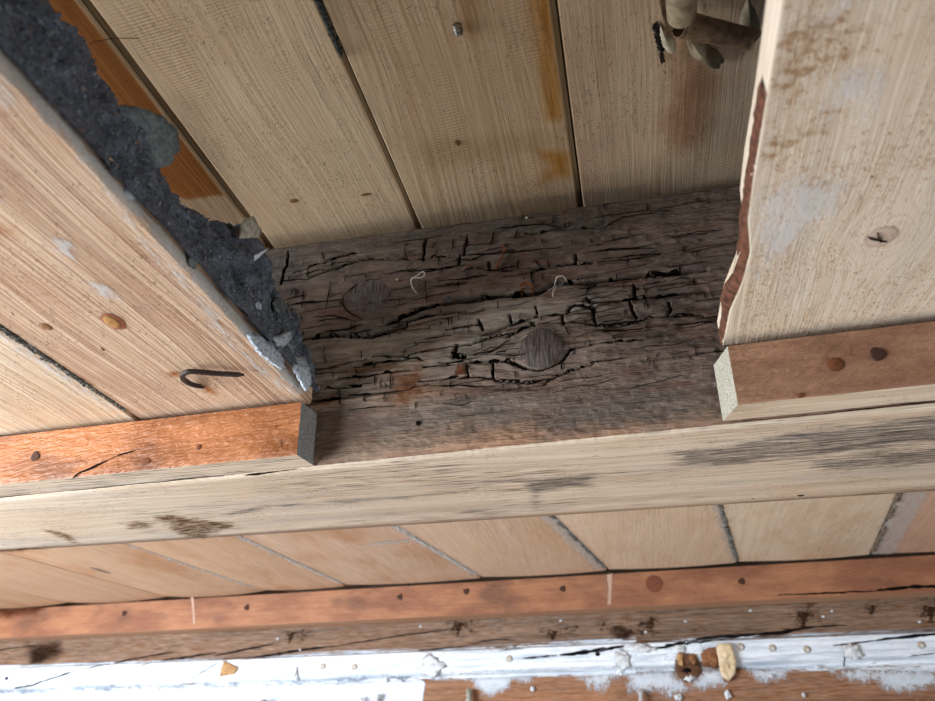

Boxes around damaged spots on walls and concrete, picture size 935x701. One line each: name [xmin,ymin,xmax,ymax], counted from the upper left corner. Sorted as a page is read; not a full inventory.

crack [279,210,712,410]
crack [73,449,217,491]
crack [245,468,295,476]
crack [779,585,935,595]